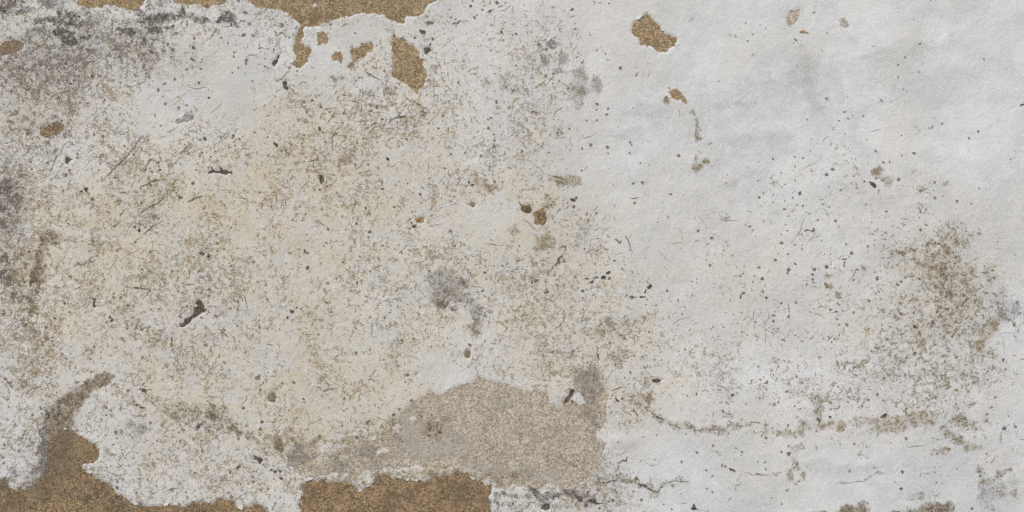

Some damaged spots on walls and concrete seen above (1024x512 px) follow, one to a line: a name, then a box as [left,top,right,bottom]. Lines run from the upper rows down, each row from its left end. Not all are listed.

peeling [73,0,144,15]
peeling [170,0,227,12]
peeling [247,0,442,96]
spalling [632,13,679,55]
spalling [668,87,687,104]
spalling [40,121,67,138]
spalling [274,365,619,512]
spalling [0,428,269,512]